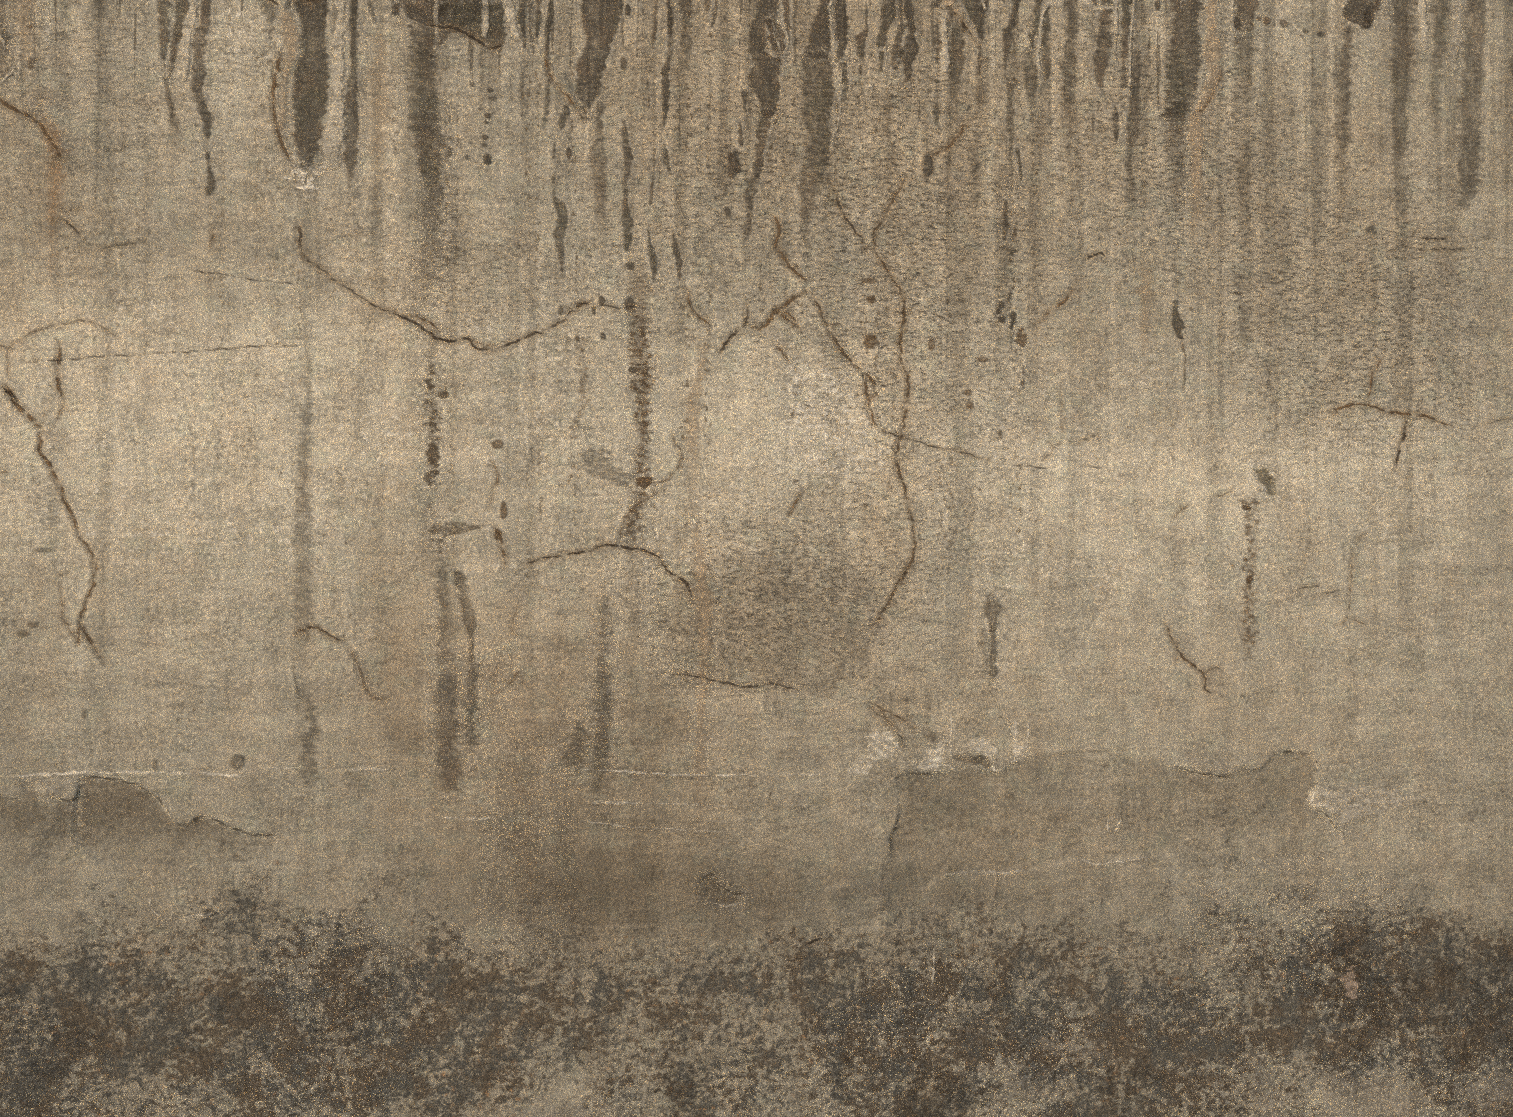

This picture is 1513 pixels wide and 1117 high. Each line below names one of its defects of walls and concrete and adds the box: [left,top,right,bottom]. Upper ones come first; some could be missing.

crack [0,319,295,656]
crack [196,227,634,350]
damp [392,0,552,206]
damp [544,0,630,158]
crack [491,438,691,595]
damp [598,122,682,279]
damp [724,0,790,224]
crack [686,124,973,626]
damp [801,0,1141,205]
damp [1155,0,1324,177]
crack [1333,359,1452,467]
flaking render [1311,783,1423,827]